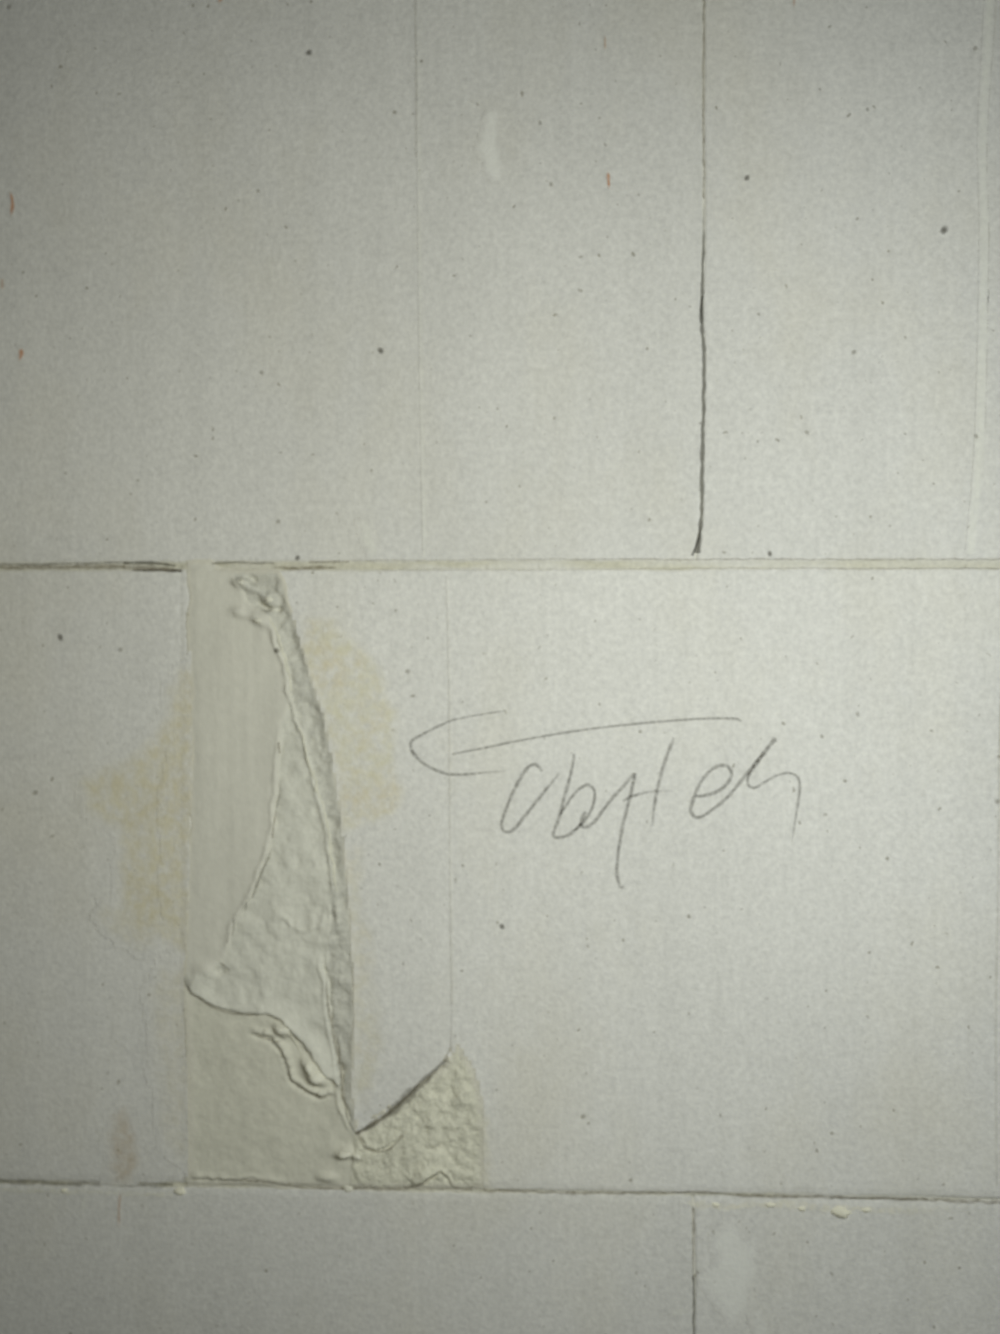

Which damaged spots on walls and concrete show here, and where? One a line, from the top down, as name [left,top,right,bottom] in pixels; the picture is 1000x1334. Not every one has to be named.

spalling [351,1044,486,1193]